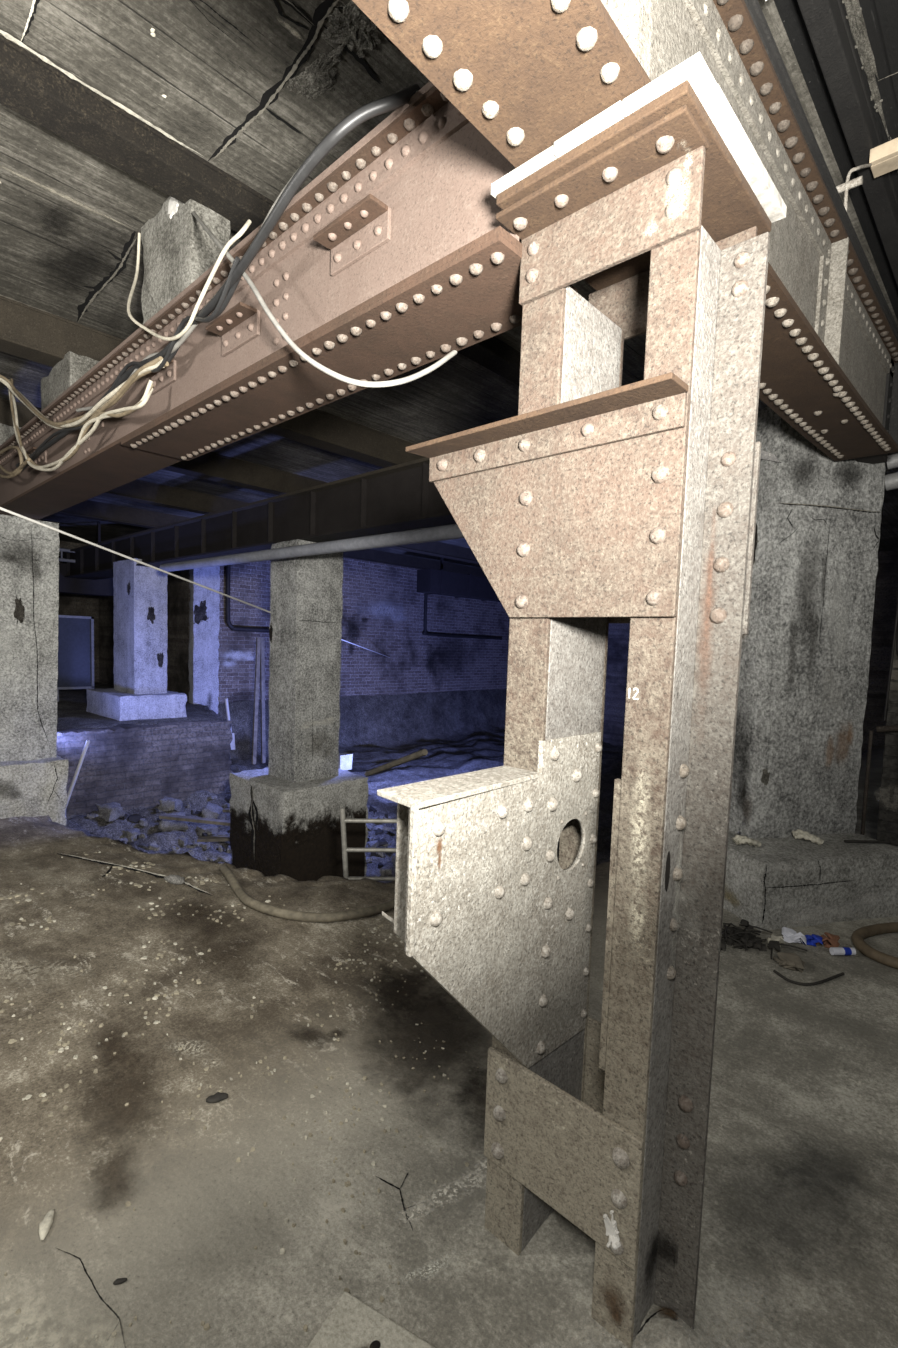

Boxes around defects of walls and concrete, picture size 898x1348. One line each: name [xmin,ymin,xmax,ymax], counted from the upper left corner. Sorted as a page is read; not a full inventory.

crack [20,0,40,43]
crack [190,0,258,47]
crack [208,0,401,161]
spalling [287,0,382,99]
spalling [13,598,25,623]
damp [230,807,366,881]
damp [100,1037,144,1119]
damp [377,975,486,1119]
crack [376,1173,426,1231]
damp [646,1237,677,1280]
crack [59,1249,127,1348]